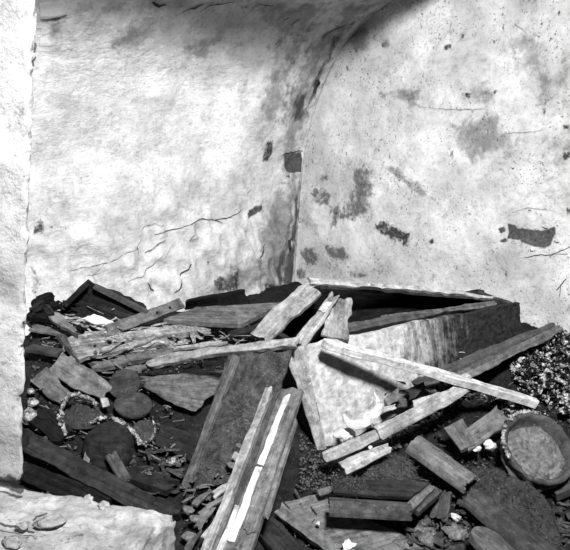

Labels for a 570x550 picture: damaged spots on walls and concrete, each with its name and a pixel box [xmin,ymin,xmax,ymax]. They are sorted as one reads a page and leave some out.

damp [294,70,322,120]
damp [263,141,273,162]
spalling [283,150,303,177]
damp [331,169,371,227]
crack [69,208,244,276]
damp [265,187,305,289]
damp [301,248,317,263]
damp [326,246,348,259]
spalling [499,224,560,251]
damp [214,272,238,291]